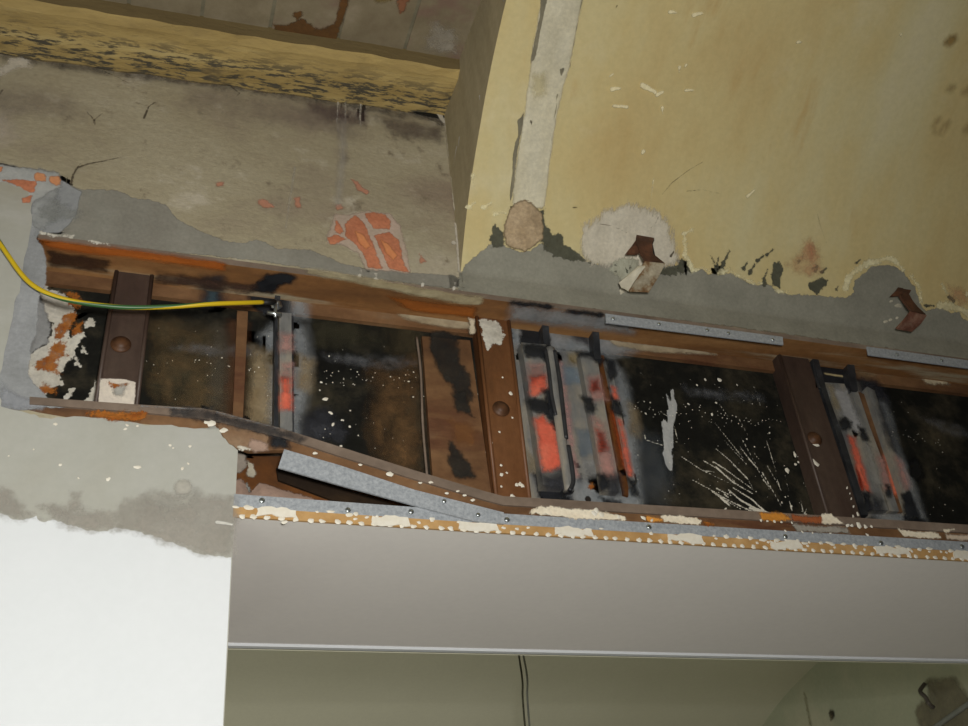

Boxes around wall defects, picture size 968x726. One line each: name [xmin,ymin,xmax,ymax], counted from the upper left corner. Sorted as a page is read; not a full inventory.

crack [70,158,116,185]
spalling [0,163,968,359]
leakage [134,496,236,554]
leakage [916,678,968,726]